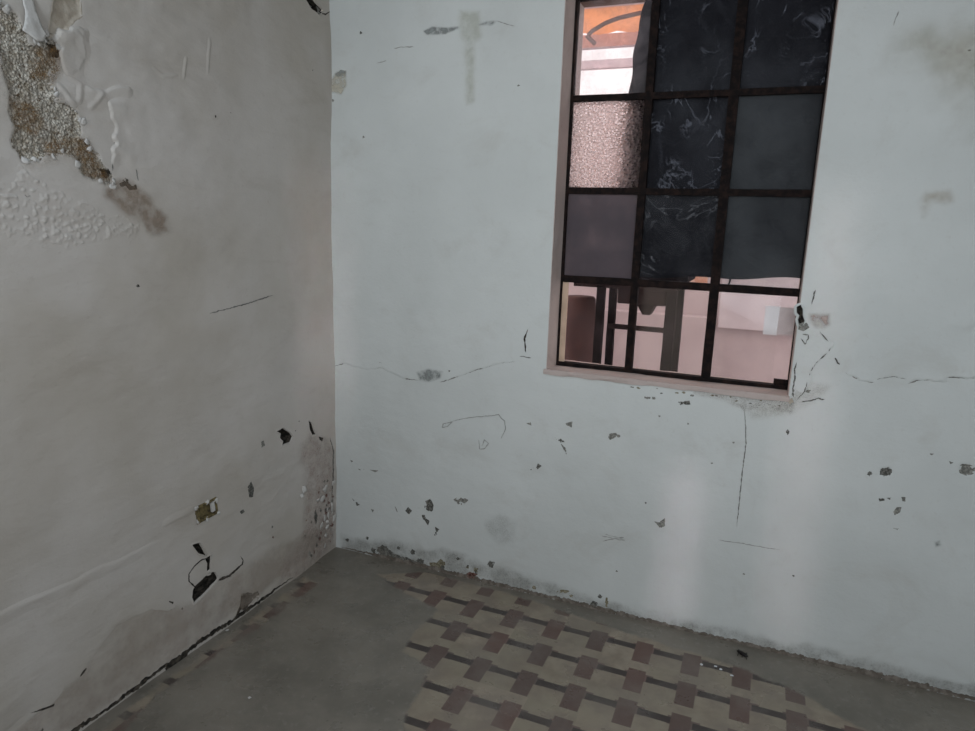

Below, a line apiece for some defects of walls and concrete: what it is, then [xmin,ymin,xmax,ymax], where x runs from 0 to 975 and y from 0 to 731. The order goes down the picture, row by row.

crack [305,0,330,18]
spalling [0,0,151,190]
crack [791,334,840,402]
crack [737,412,747,520]
spalling [949,461,975,476]
peeling [395,499,439,536]
hole [169,541,244,610]